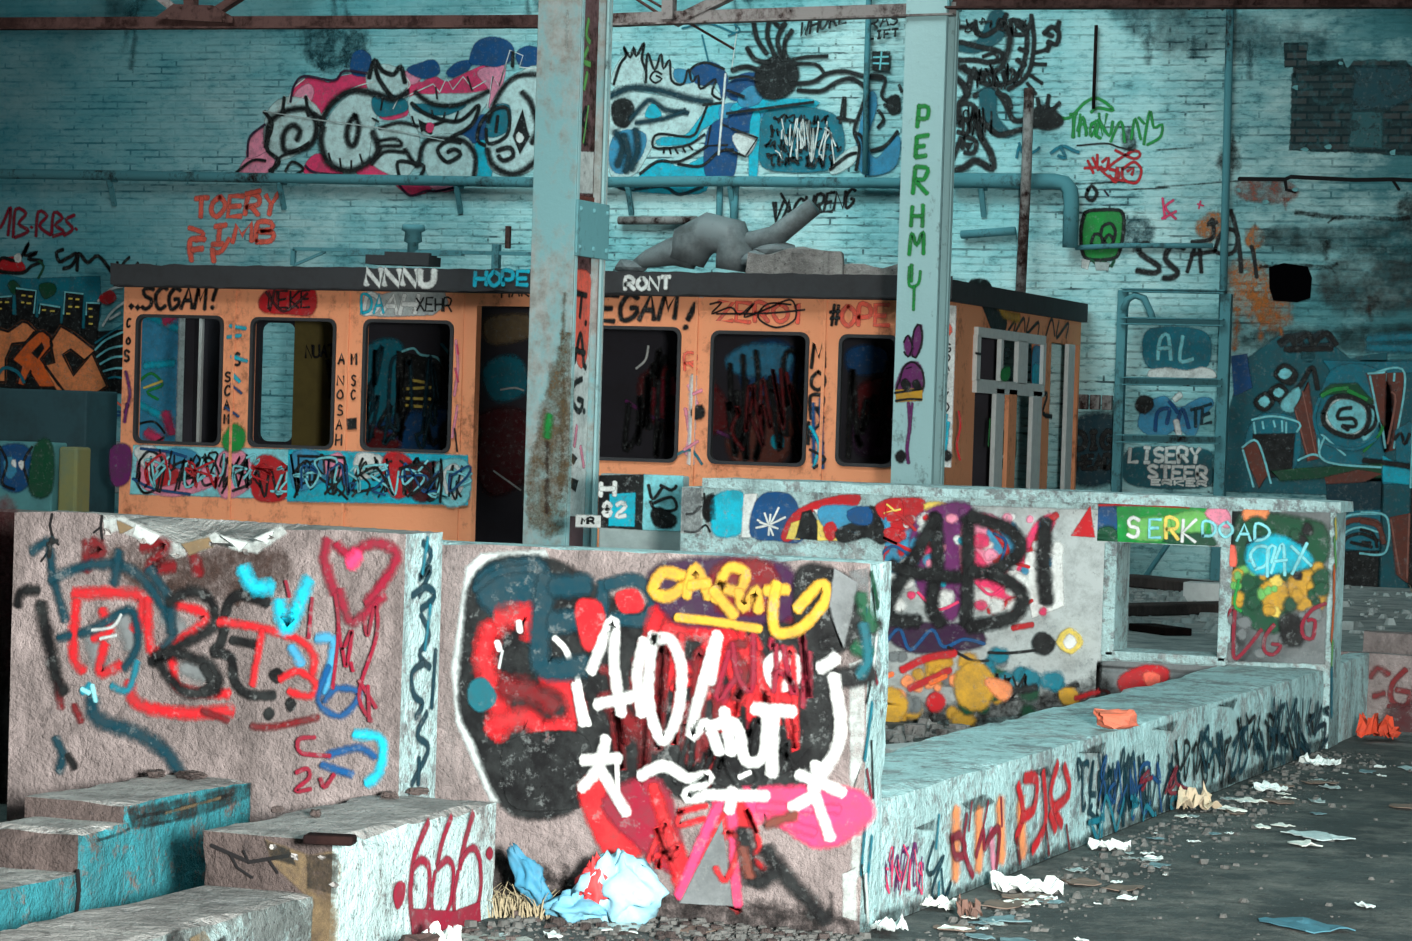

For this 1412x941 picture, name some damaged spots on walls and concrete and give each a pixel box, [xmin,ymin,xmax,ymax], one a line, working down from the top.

spalling [1284,42,1412,156]
damp [1264,226,1412,312]
corrosion [526,294,572,536]